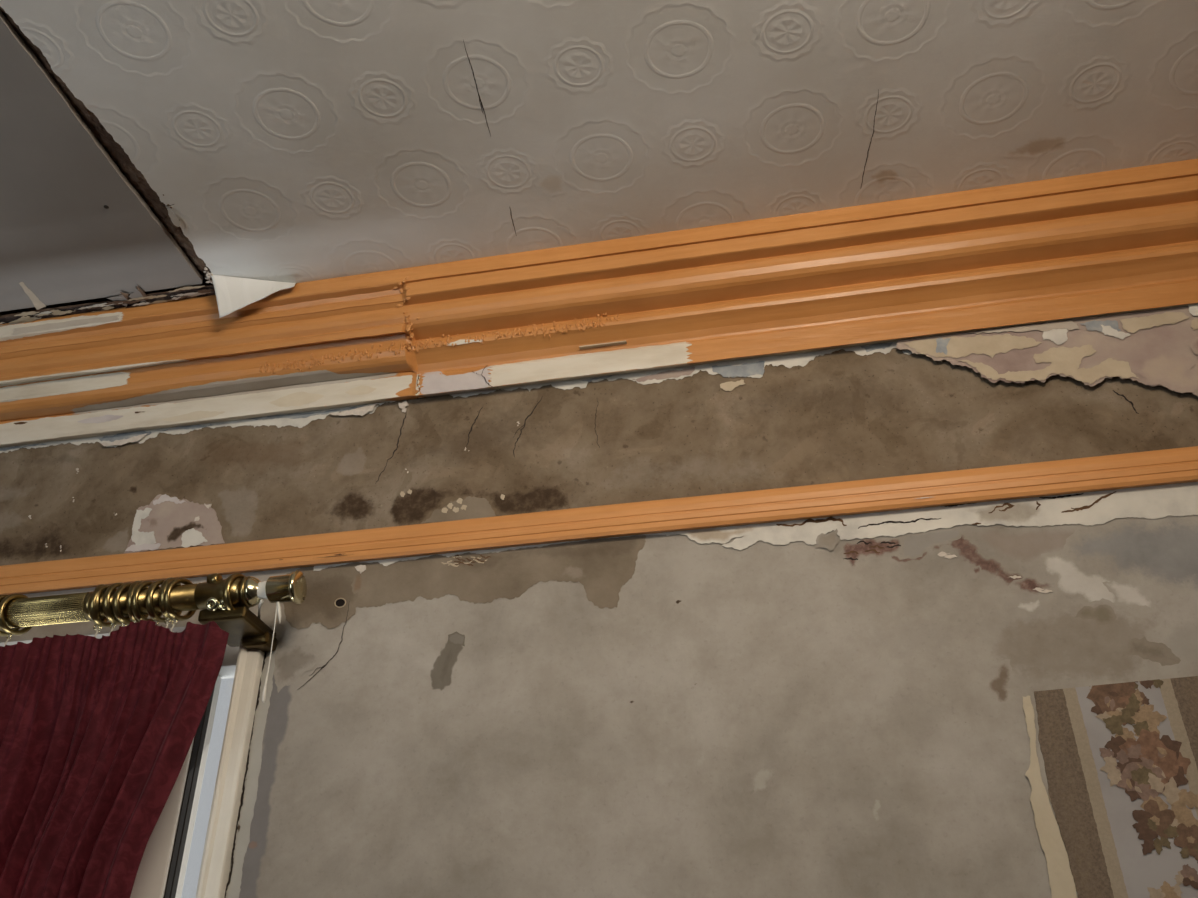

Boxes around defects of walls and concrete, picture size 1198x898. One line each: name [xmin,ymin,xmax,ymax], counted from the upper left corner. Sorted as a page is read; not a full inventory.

crack [463,40,491,136]
crack [0,7,213,284]
crack [861,89,879,185]
crack [376,376,420,482]
crack [467,368,498,444]
leakage [163,398,802,541]
crack [513,396,543,458]
flaking render [0,303,1198,558]
leakage [663,361,946,432]
flaking render [300,482,1198,609]
leakage [429,631,465,692]